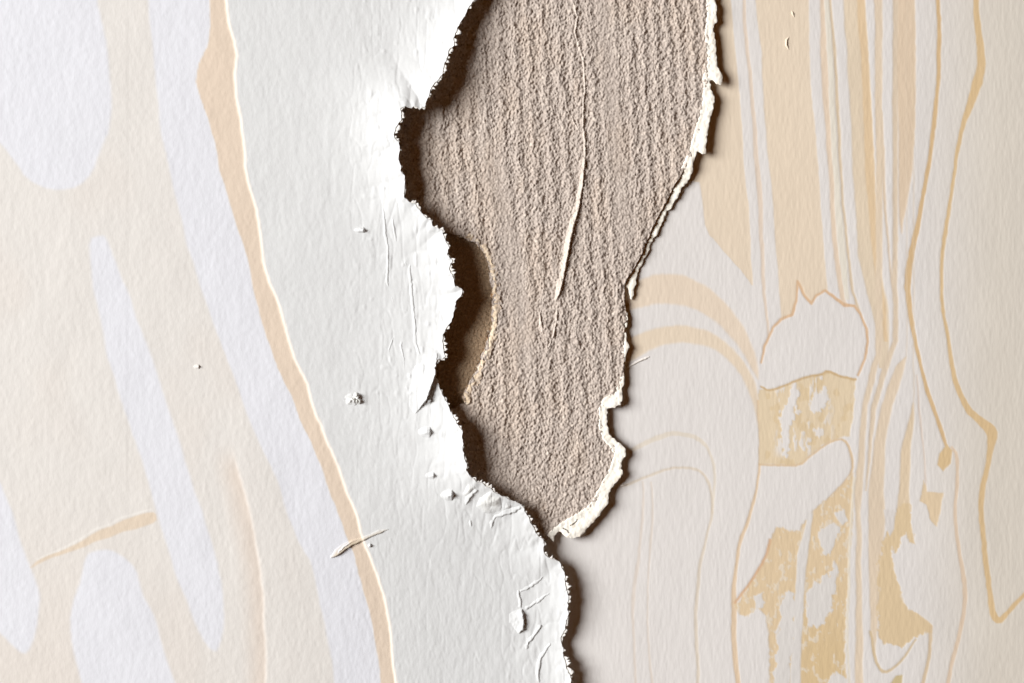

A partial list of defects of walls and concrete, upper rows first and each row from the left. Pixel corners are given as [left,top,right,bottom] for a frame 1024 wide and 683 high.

spalling [463,484,521,529]